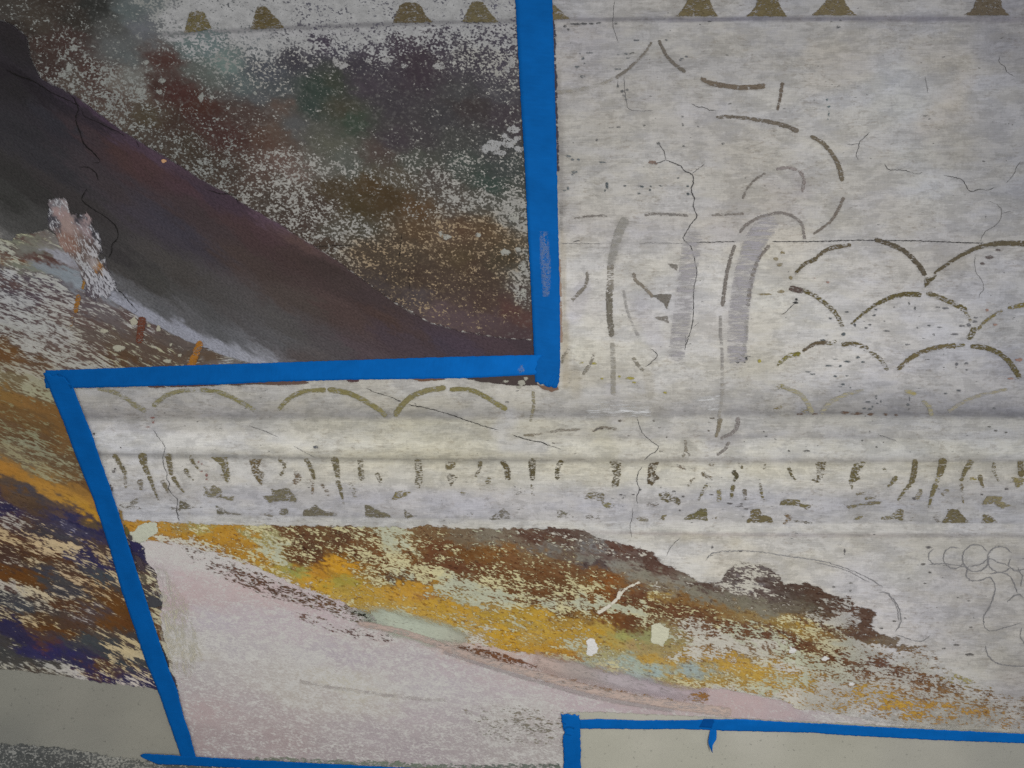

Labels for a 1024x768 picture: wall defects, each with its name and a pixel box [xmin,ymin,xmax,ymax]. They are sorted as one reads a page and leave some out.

crack [7,70,156,258]
peeling [0,0,533,340]
crack [658,145,703,348]
crack [369,389,560,449]
peeling [119,509,1024,730]